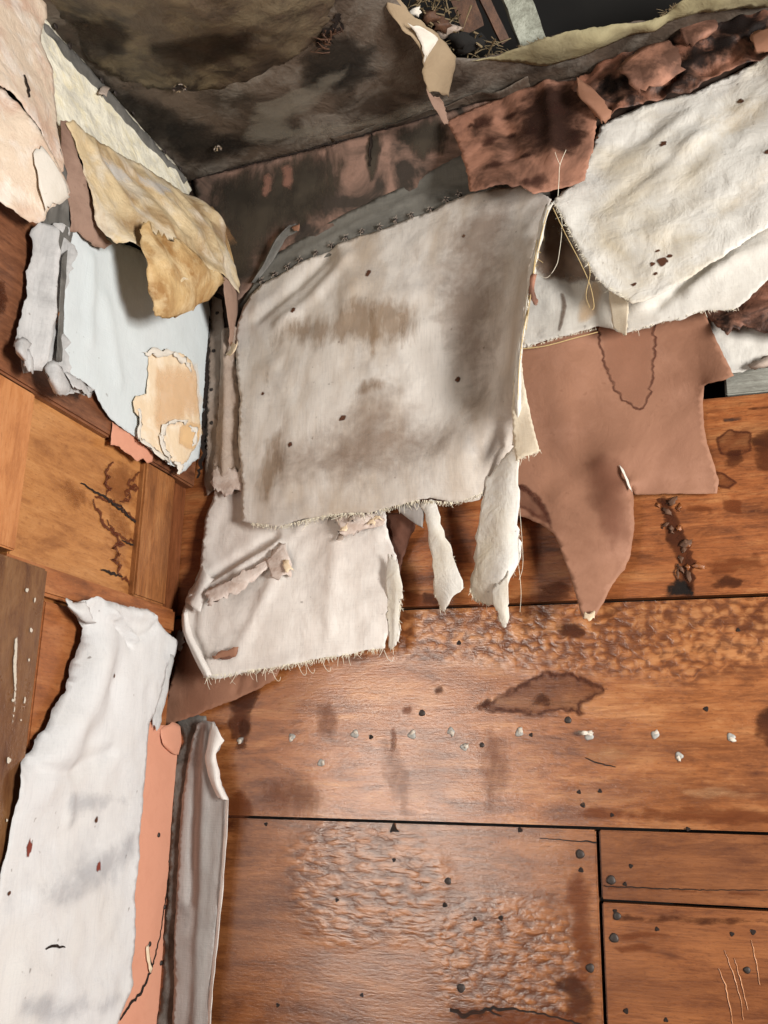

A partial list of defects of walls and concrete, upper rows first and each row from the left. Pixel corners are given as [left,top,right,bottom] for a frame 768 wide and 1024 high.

peeling [133,347,201,475]
leakage [716,419,768,513]
crack [81,482,136,546]
crack [101,569,123,577]
leakage [478,671,604,715]
crack [450,1006,581,1024]